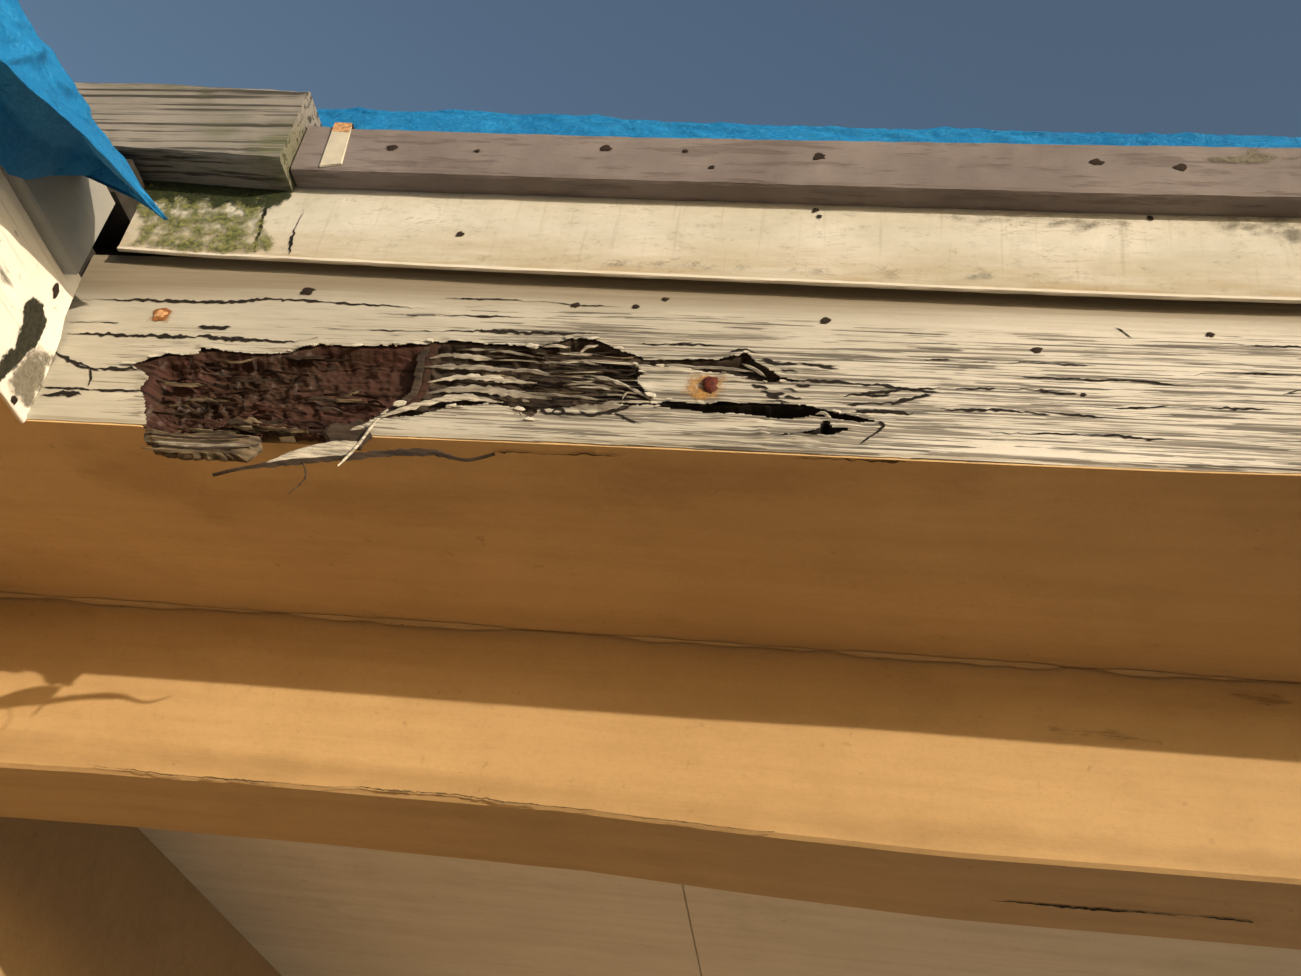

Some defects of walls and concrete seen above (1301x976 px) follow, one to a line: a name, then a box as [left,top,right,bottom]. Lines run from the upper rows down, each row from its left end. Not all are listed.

crack [254,208,304,253]
crack [41,297,717,397]
spalling [372,336,672,421]
crack [539,405,641,424]
rust [687,375,721,400]
crack [754,343,1301,464]
crack [494,450,614,458]
crack [989,900,1254,923]